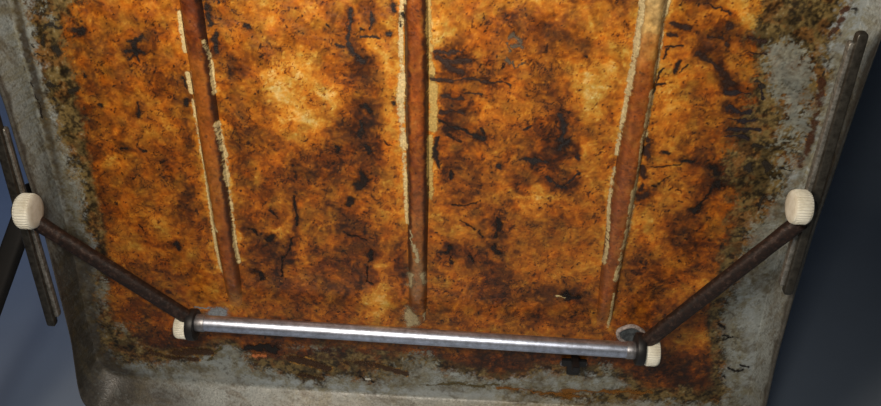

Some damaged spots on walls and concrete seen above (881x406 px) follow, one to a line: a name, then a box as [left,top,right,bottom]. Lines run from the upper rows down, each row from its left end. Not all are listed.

rust [828,6,858,39]
rust [798,77,826,168]
rust [148,347,223,362]